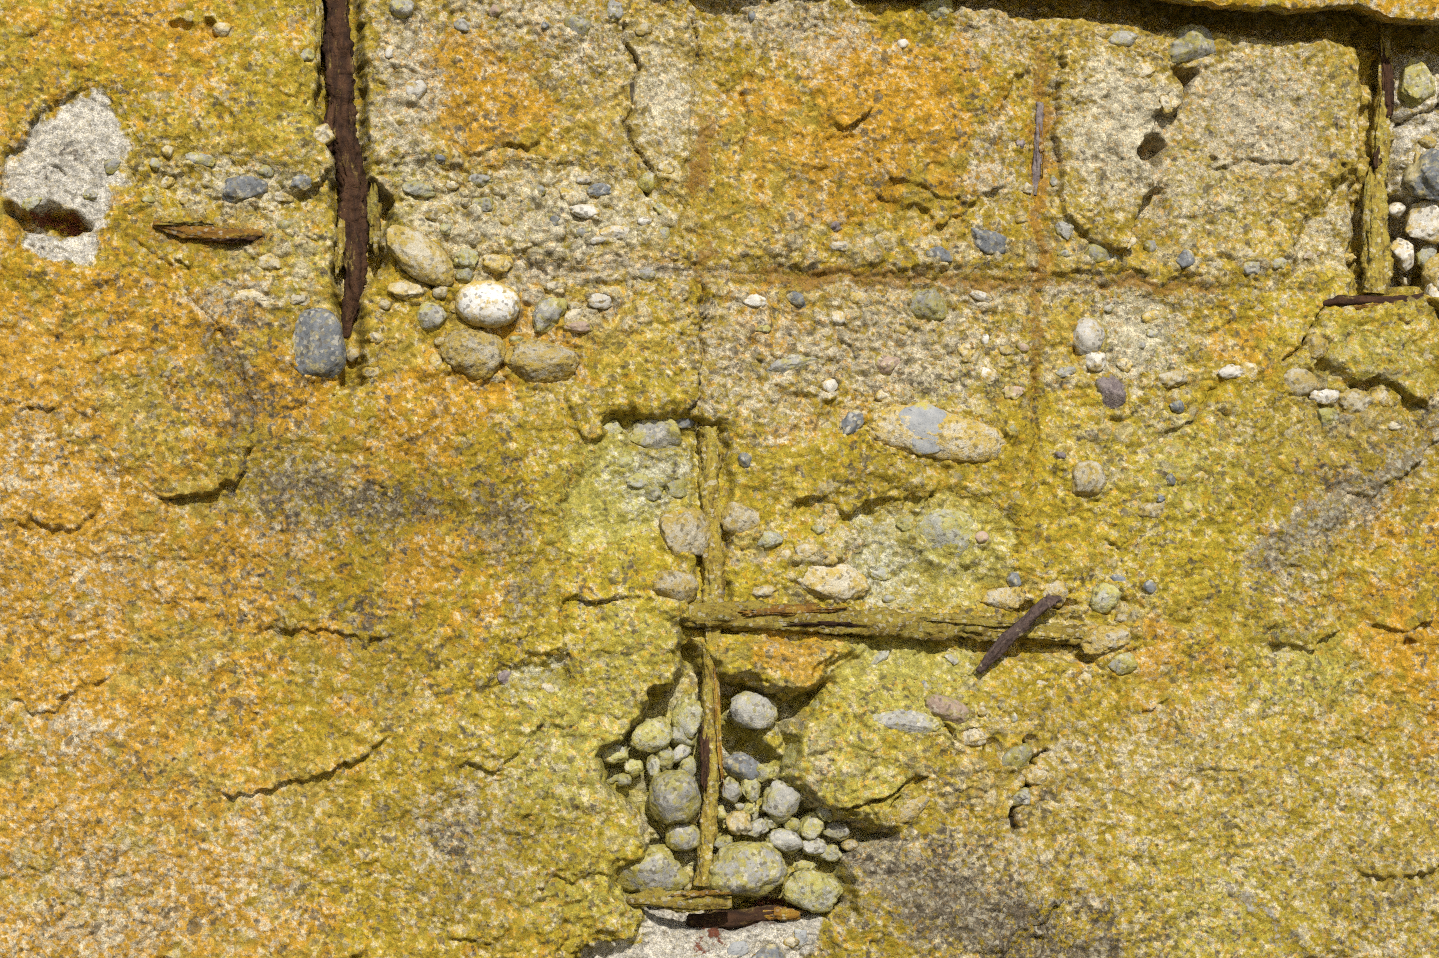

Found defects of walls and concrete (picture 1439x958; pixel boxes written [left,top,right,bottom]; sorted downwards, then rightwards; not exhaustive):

spalling [0,80,322,266]
corrosion [133,219,272,251]
corrosion [314,0,382,338]
corrosion [693,45,1230,401]
spalling [1369,39,1439,287]
spalling [557,407,702,552]
spalling [574,637,980,958]
corrosion [626,426,1087,953]